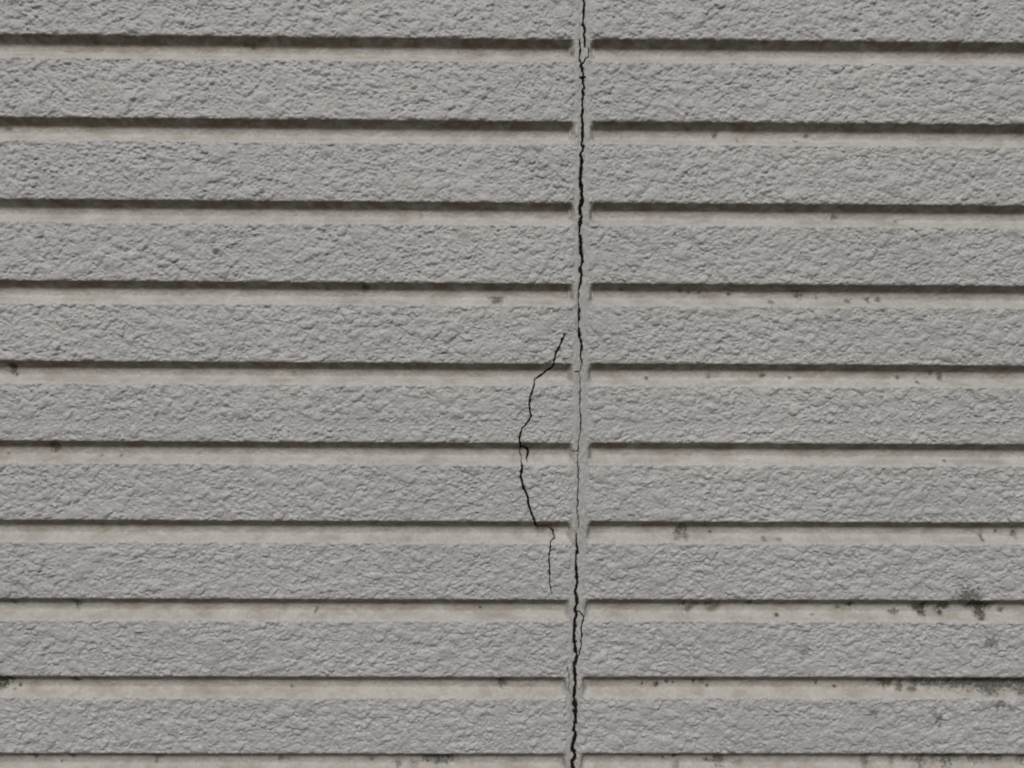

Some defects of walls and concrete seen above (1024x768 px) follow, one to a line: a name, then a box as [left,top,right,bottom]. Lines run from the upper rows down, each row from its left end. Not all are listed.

crack [518,0,589,768]